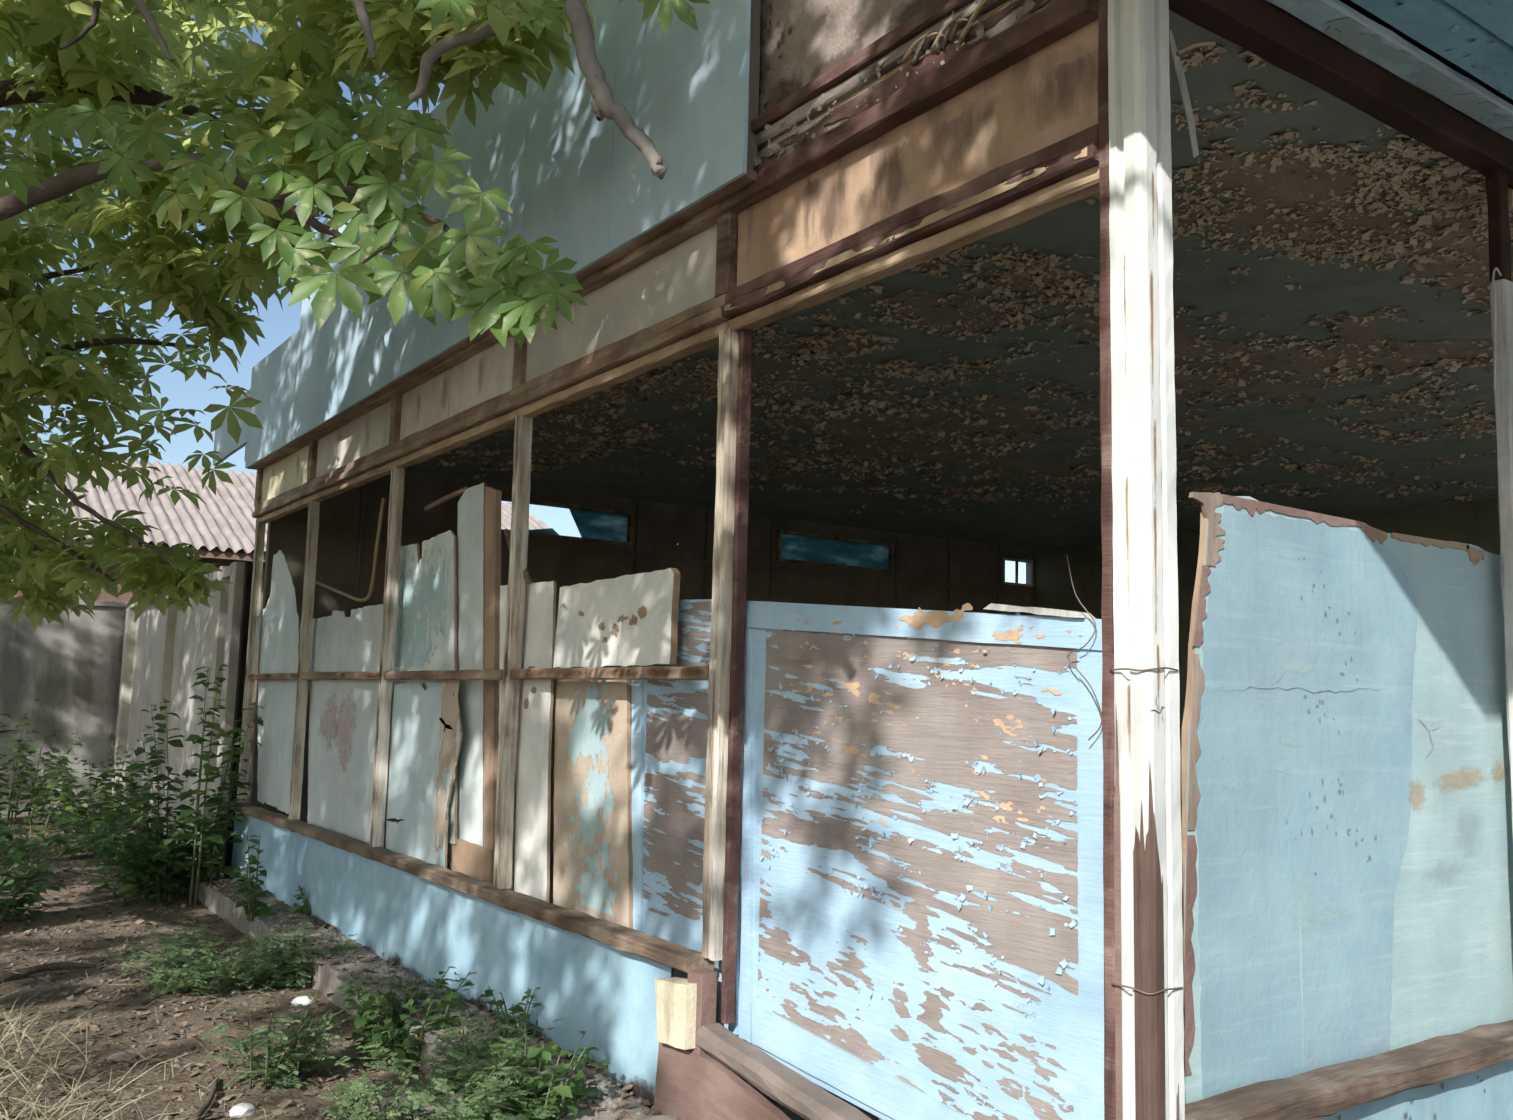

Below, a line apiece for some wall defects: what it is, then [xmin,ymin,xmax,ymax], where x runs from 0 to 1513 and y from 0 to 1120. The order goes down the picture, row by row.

water stain [759,17,797,108]
peeling [754,0,1048,172]
peeling [1325,18,1513,136]
peeling [813,167,1048,274]
peeling [437,344,719,484]
peeling [749,231,1102,519]
peeling [561,603,650,647]
peeling [1114,45,1497,1120]
peeling [563,680,618,915]
peeling [643,601,712,920]
peeling [758,599,1082,1120]